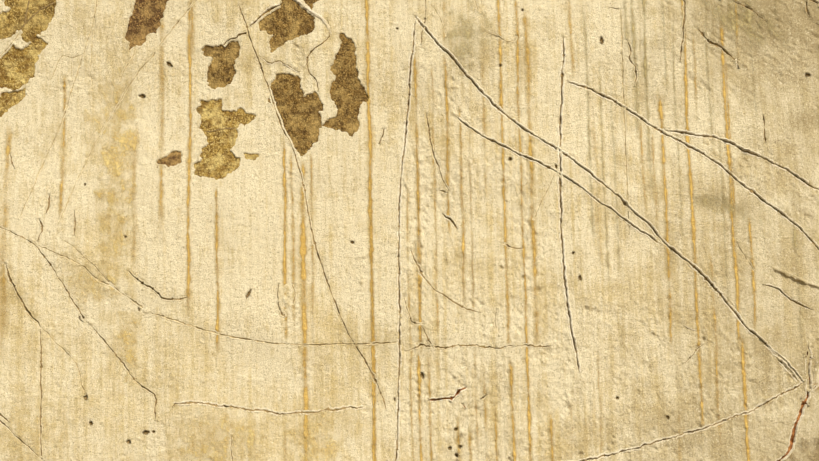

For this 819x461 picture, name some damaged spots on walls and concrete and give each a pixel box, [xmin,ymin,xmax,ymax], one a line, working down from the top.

peeling [0,0,57,117]
crack [0,261,86,461]
peeling [125,0,169,50]
peeling [194,99,259,180]
crack [0,0,552,420]
corrosion [283,149,313,461]
peeling [258,0,369,157]
corrosion [365,0,376,461]
corrosion [519,125,538,461]
crack [609,6,638,234]
corrosion [684,34,703,421]
crack [678,0,741,68]